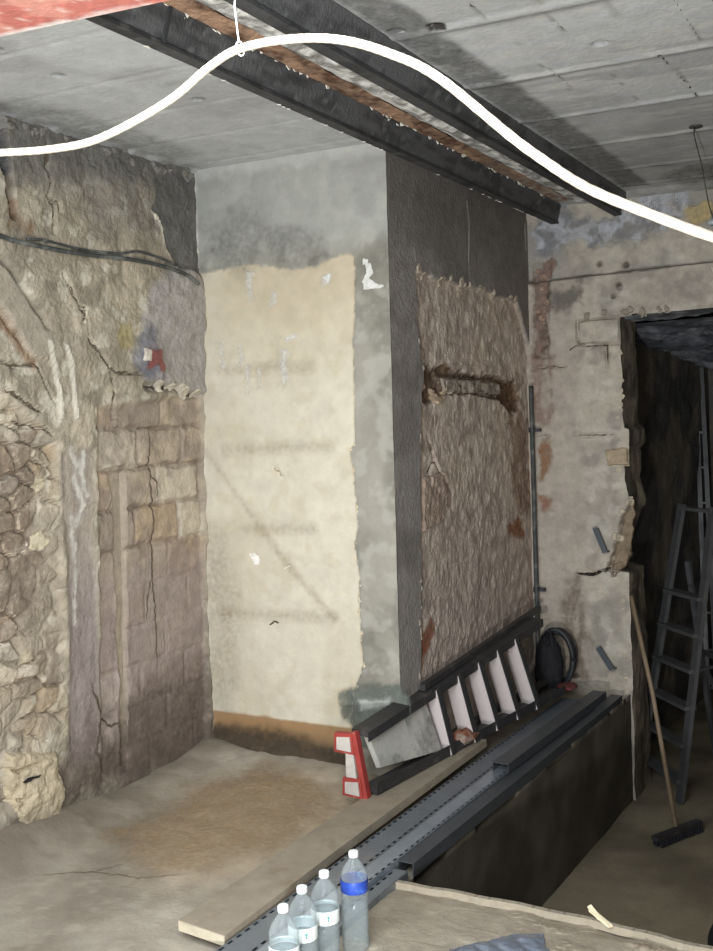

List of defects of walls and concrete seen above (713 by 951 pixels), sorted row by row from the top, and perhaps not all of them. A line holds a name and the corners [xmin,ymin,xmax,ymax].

peeling [423,384,447,405]
corrosion [539,443,551,479]
spalling [605,447,629,487]
flaking render [422,471,451,532]
crack [146,418,158,662]
spalling [577,497,635,610]
flaking render [419,605,434,657]